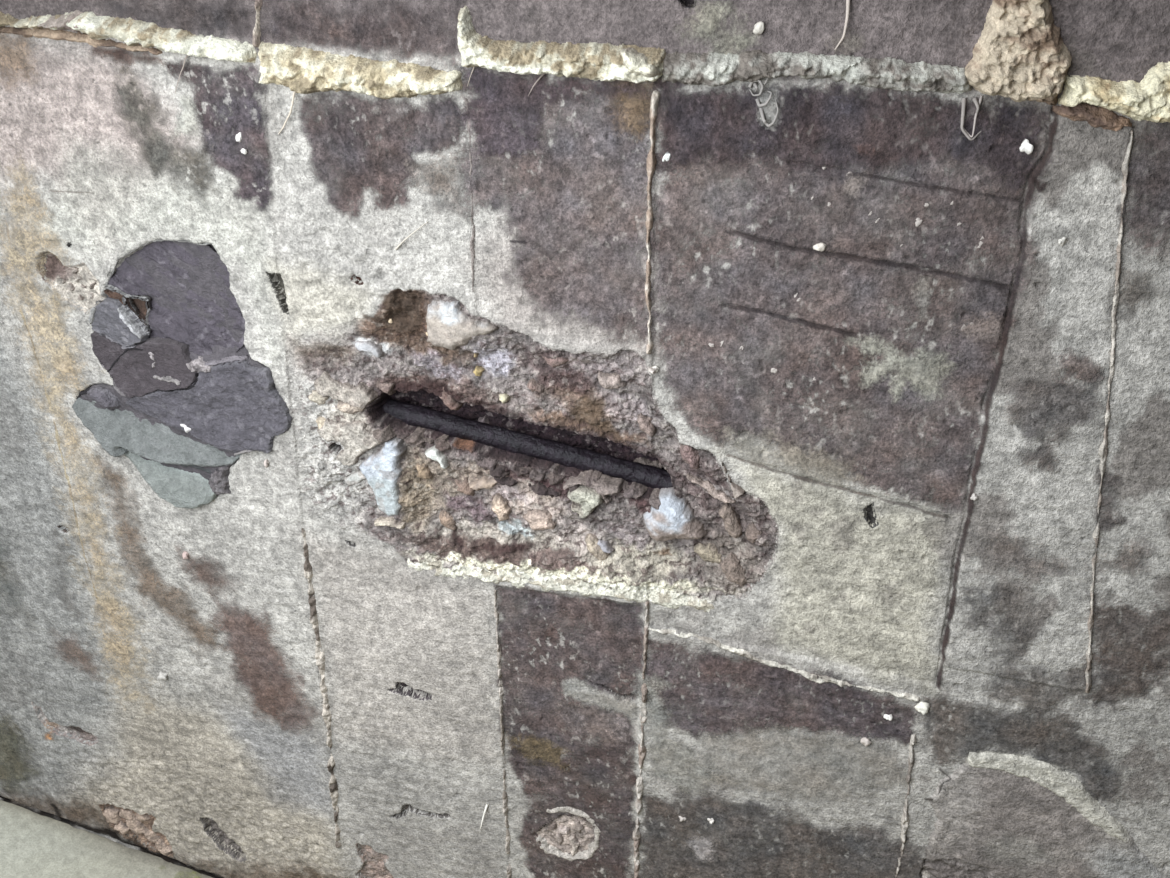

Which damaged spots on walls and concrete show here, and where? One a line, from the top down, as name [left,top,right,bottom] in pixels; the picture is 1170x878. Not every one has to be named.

water stain [168,0,246,40]
water stain [92,47,273,211]
water stain [260,0,1051,512]
spalling [36,251,780,612]
water stain [1009,354,1104,471]
water stain [1096,469,1125,530]
water stain [100,465,314,730]
water stain [495,584,1170,878]
spalling [99,803,175,857]